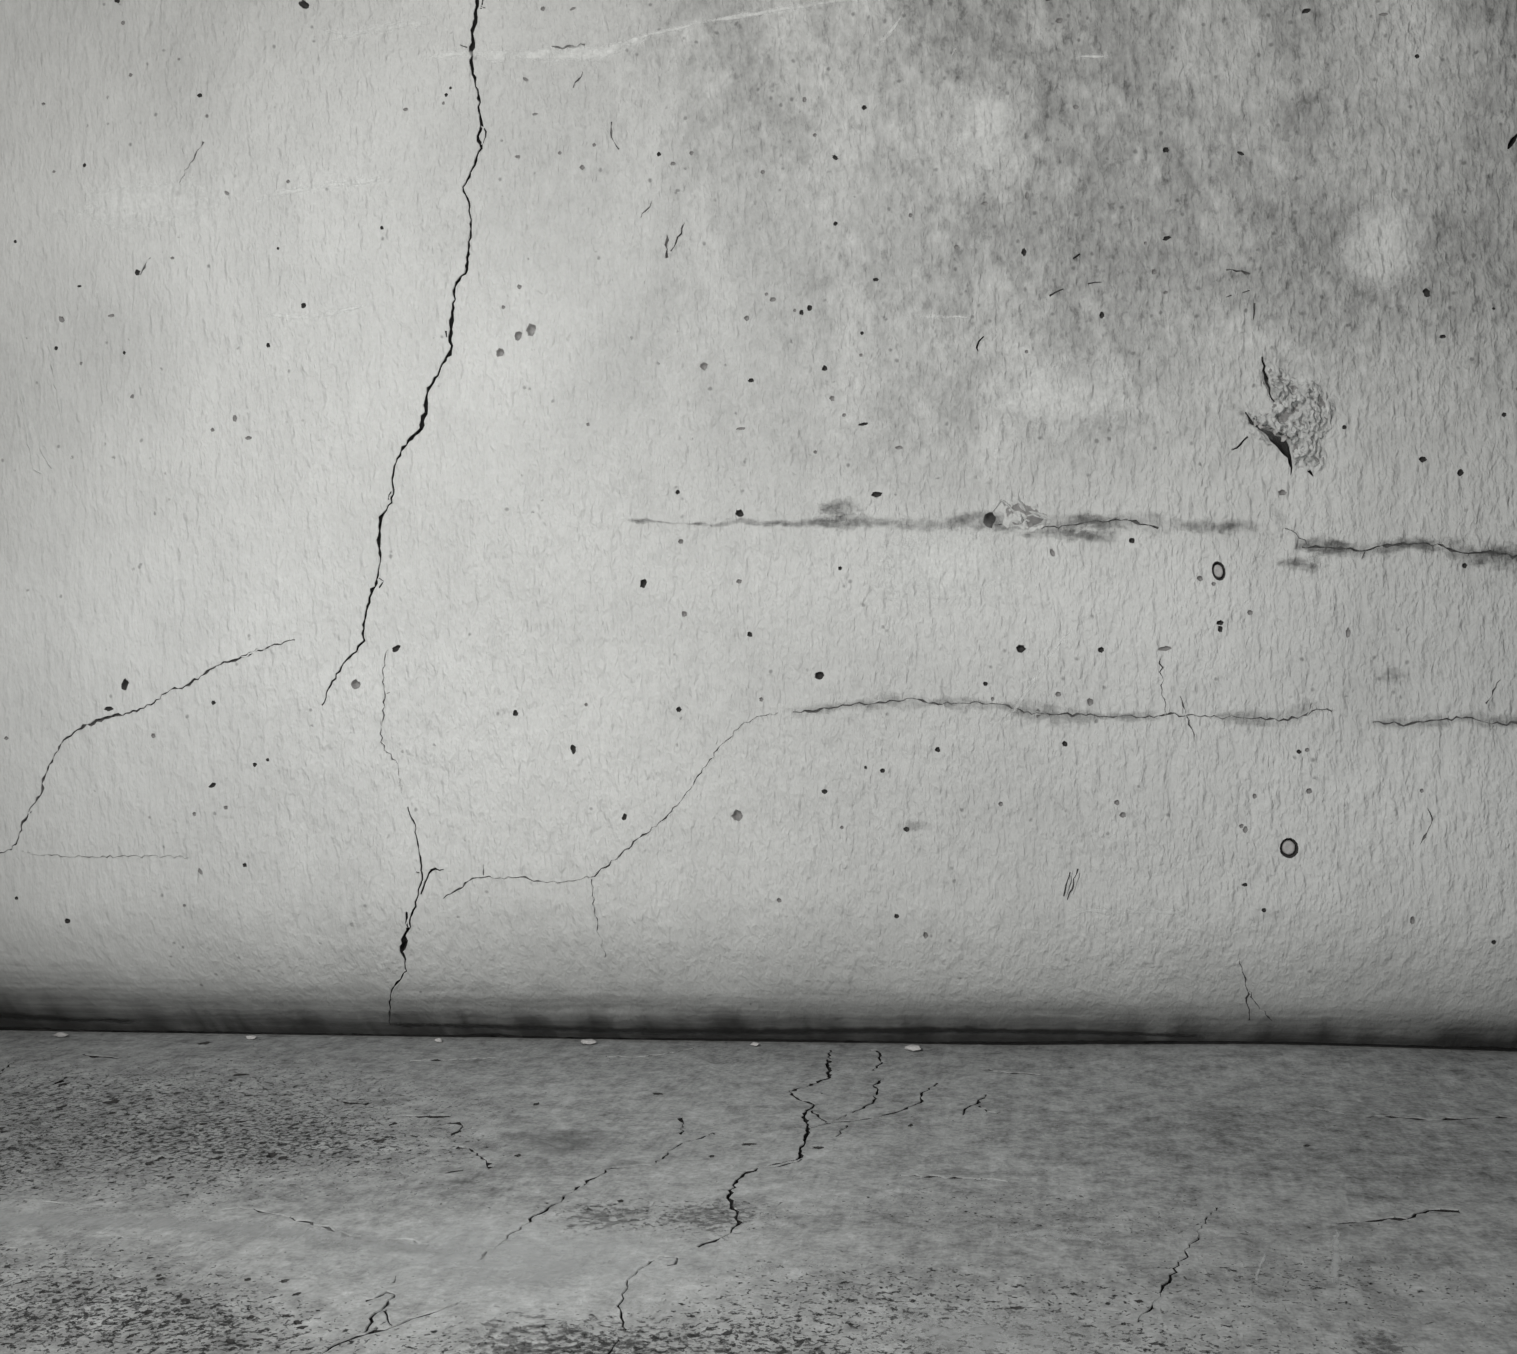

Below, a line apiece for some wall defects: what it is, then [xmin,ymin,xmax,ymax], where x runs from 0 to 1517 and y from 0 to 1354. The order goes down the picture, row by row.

spalling [1245,358,1347,474]
crack [320,0,1333,1022]
crack [1284,527,1517,562]
crack [0,638,295,861]
crack [1373,679,1517,728]
crack [475,1118,714,1262]
crack [605,1048,1041,1354]
crack [200,1206,462,1354]